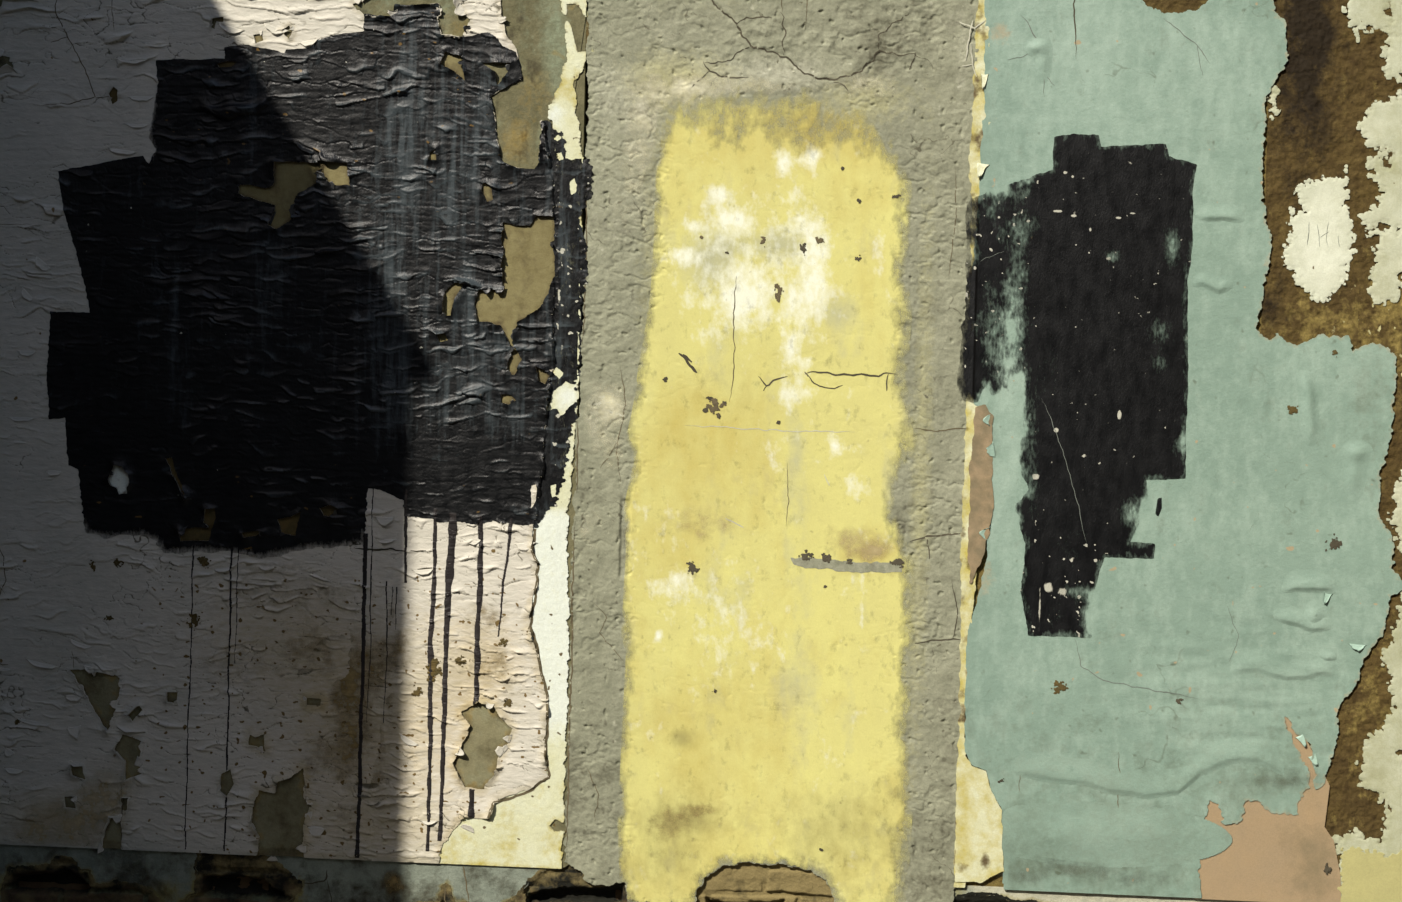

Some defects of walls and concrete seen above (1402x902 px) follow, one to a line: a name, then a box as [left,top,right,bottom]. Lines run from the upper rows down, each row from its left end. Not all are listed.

peeling [353,0,470,36]
peeling [481,0,594,169]
crack [693,0,933,90]
flaking render [1143,0,1208,13]
peeling [237,161,350,229]
flaking render [1261,0,1402,886]
peeling [71,669,146,779]
peeling [453,698,513,789]
flaking render [179,768,325,902]
flaking render [505,864,627,902]
flaking render [696,862,834,902]
flaking render [953,892,1038,902]